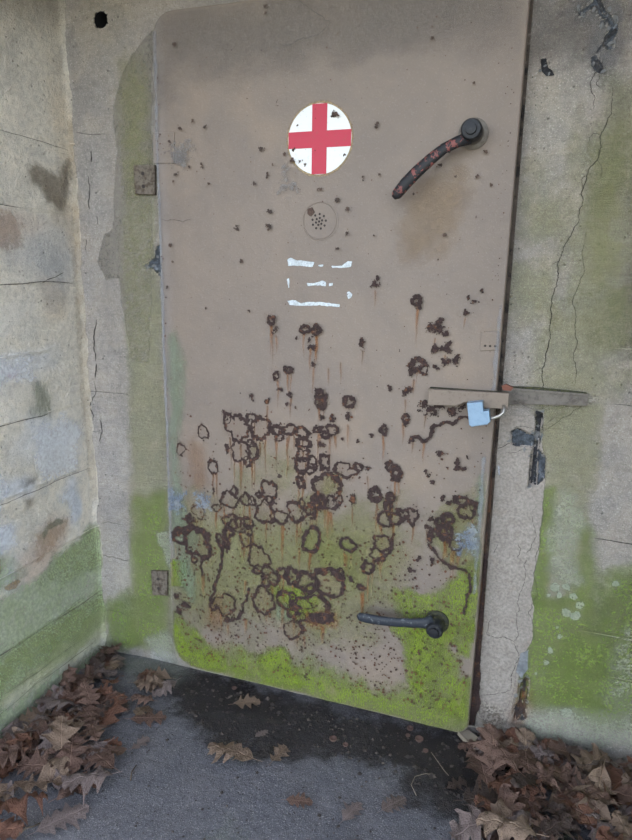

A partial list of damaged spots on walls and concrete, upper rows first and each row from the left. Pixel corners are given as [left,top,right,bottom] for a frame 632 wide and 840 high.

spalling [577,0,619,73]
crack [542,70,613,386]
rust [410,286,423,310]
rust [272,366,296,409]
rust [295,323,323,368]
rust [377,317,468,451]
spalling [507,410,546,488]
rust [166,383,497,726]
damp [518,489,603,707]